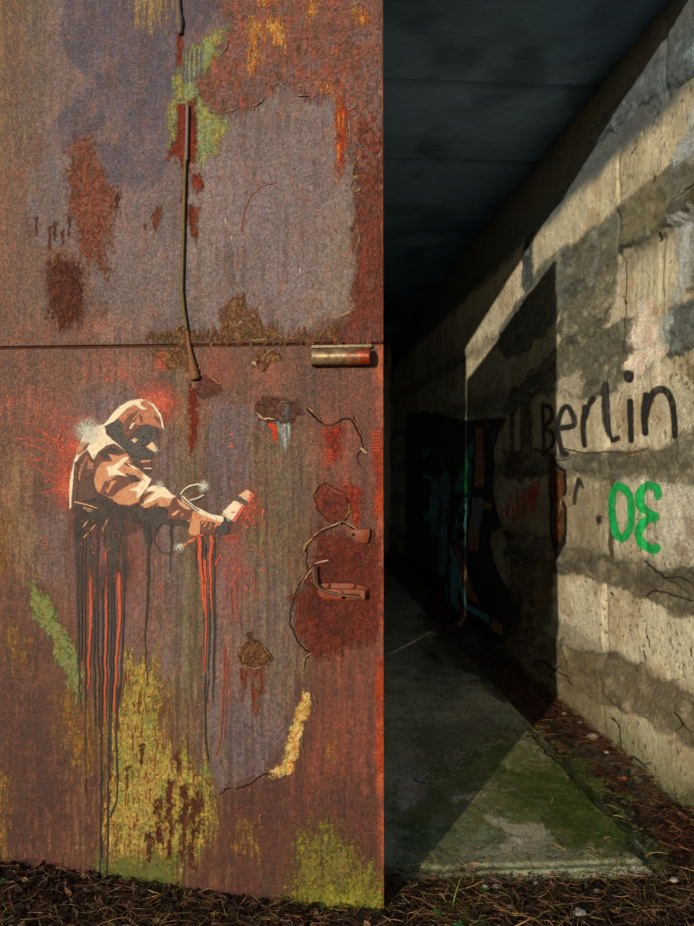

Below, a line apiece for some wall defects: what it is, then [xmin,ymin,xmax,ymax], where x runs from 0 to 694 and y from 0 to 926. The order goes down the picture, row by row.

corrosion [35,122,124,289]
corrosion [166,97,204,244]
peeling [144,0,383,373]
corrosion [332,94,350,183]
leakage [621,174,694,303]
corrosion [184,383,200,456]
peeling [254,395,303,448]
crack [306,408,367,466]
leakage [623,299,675,387]
leakage [661,357,694,432]
crack [289,521,357,668]
corrosion [288,424,383,661]